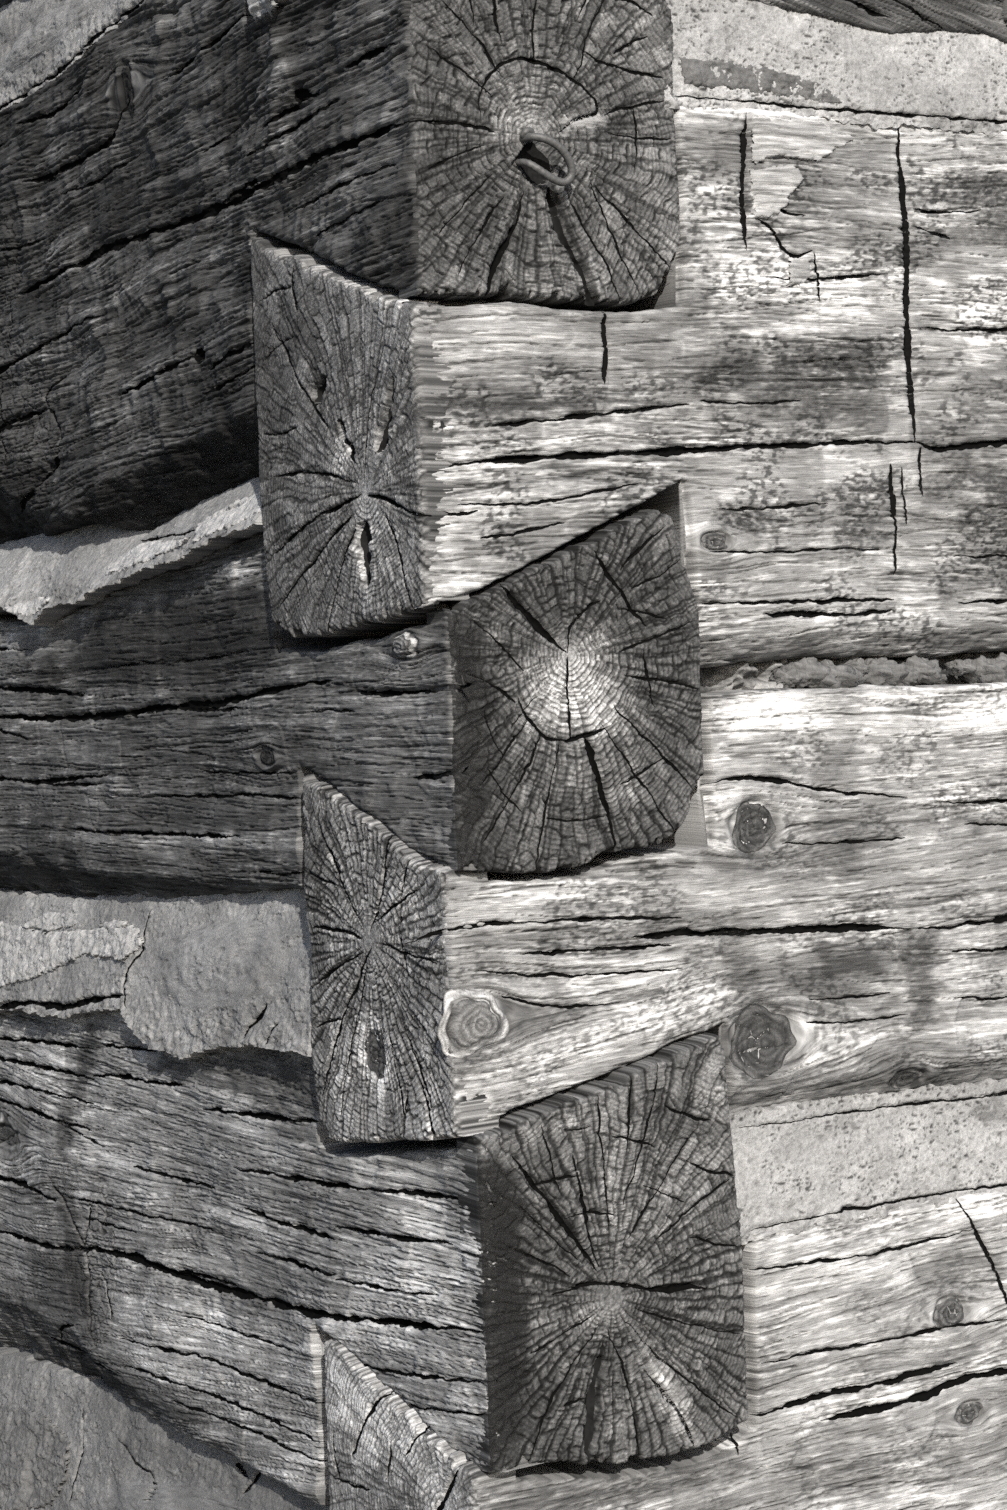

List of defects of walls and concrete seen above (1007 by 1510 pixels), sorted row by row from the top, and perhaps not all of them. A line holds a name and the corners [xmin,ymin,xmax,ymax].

crack [0,0,1007,514]
crack [120,265,1007,631]
crack [0,526,1007,863]
crack [0,770,1007,1147]
crack [0,1064,1007,1501]
crack [437,1468,460,1510]